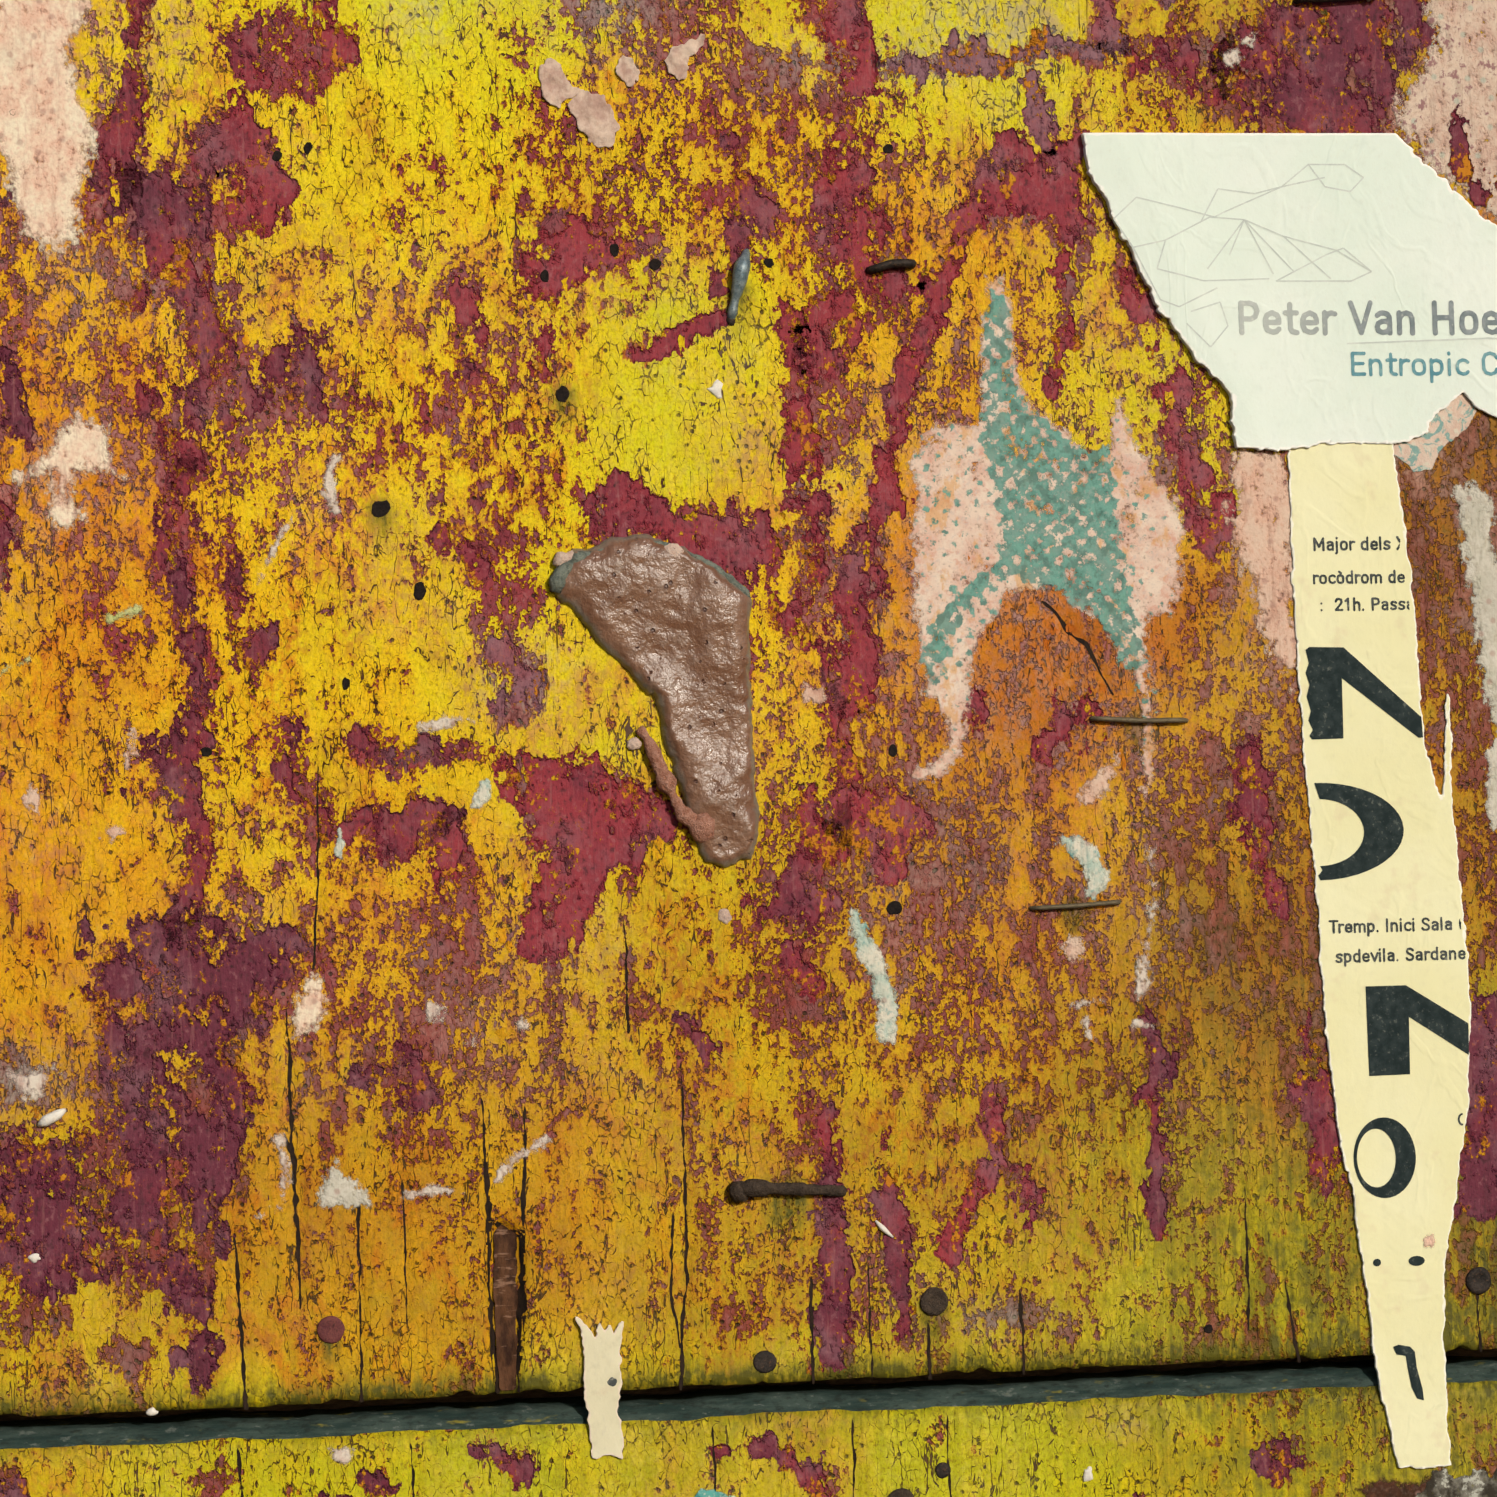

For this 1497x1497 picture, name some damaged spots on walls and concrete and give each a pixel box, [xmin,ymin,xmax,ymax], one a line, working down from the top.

peeling [1447,103,1497,207]
peeling [581,0,1439,1005]
peeling [0,0,375,1401]
crack [1041,601,1114,695]
crack [233,1237,249,1410]
crack [284,1009,302,1309]
crack [356,1205,364,1402]
crack [400,1181,408,1325]
crack [481,1098,528,1393]
peeling [1280,1000,1349,1200]
peeling [1453,990,1497,1222]
crack [236,1448,244,1497]